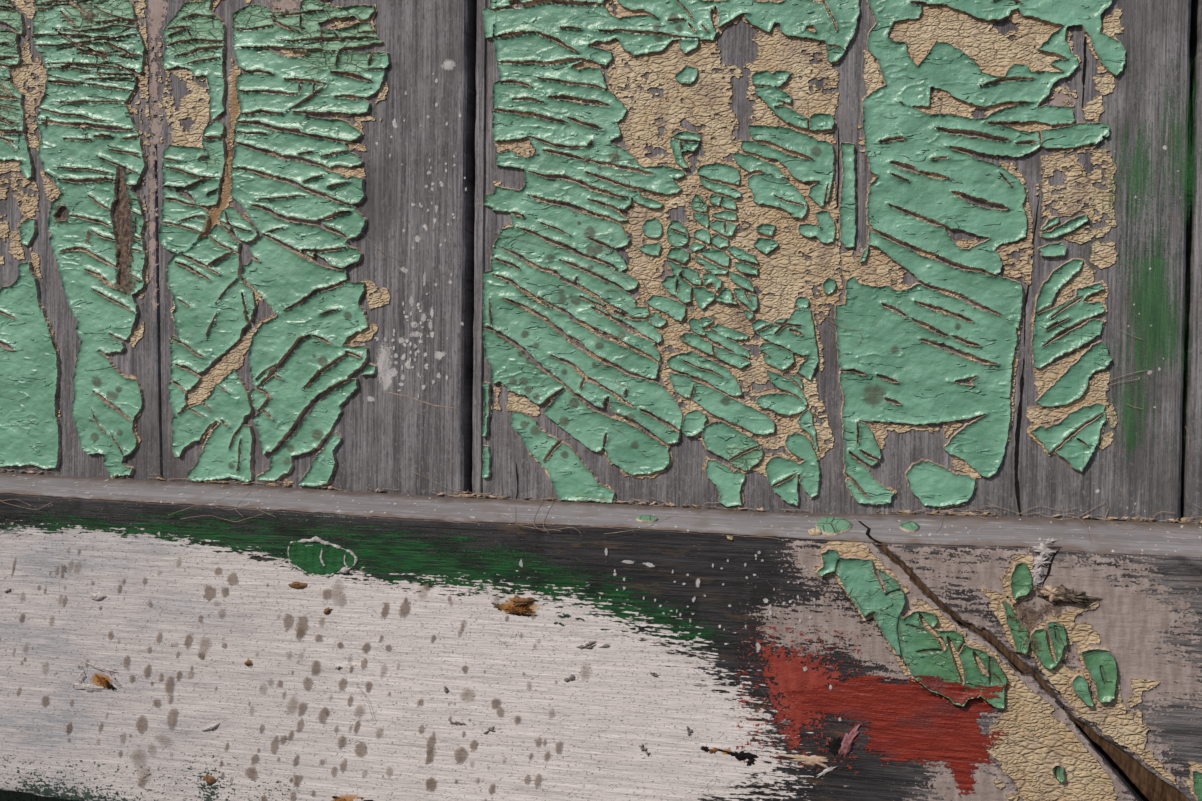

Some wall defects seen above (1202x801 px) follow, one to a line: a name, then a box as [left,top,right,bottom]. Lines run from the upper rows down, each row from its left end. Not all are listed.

peeling [0,0,391,488]
peeling [481,0,1127,508]
peeling [737,517,1202,801]
crack [858,521,1190,801]